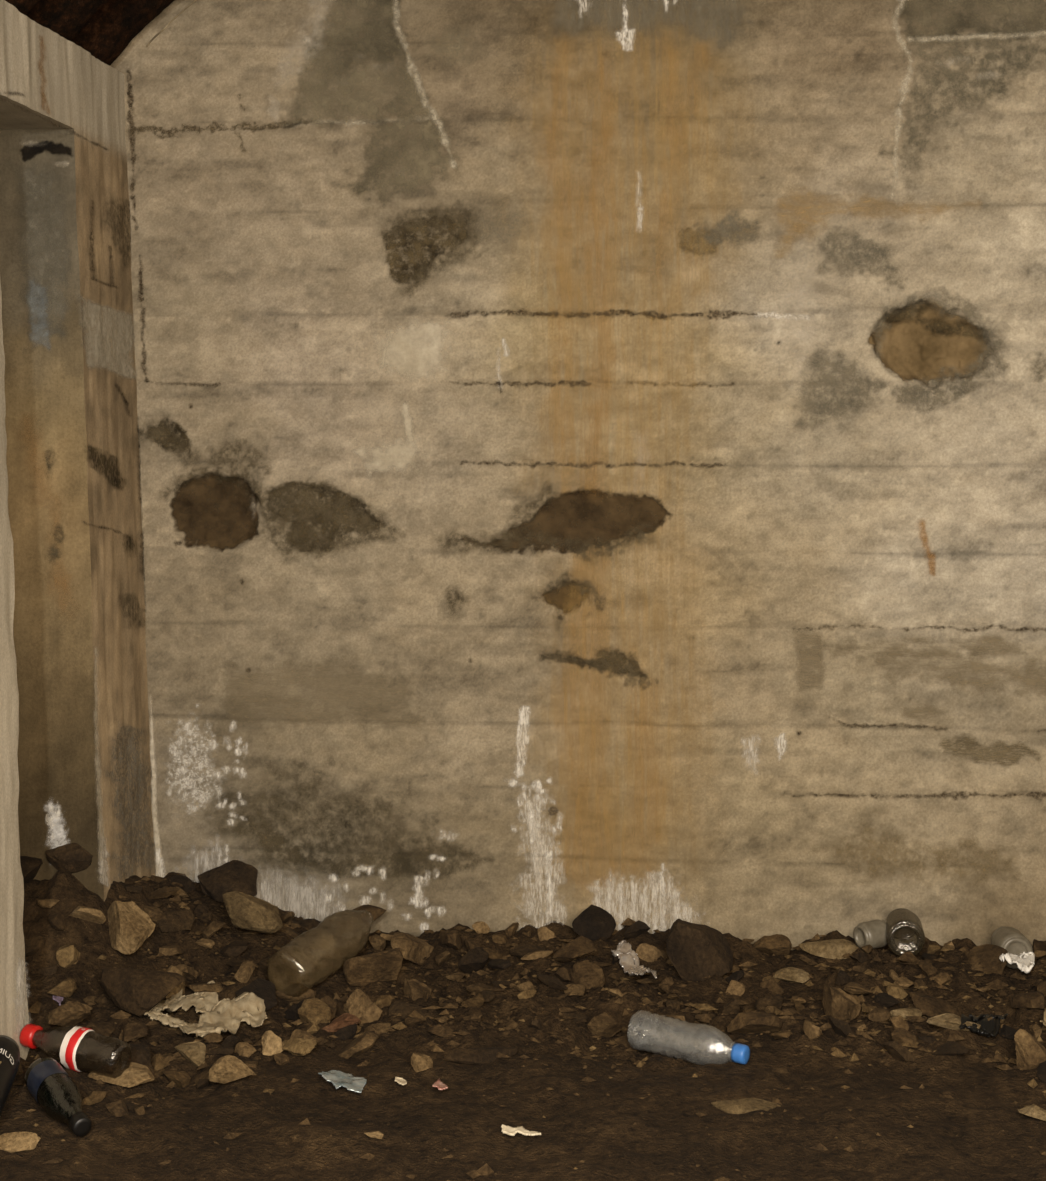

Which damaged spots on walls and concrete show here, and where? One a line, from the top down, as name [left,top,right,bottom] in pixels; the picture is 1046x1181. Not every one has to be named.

crack [2,40,312,222]
spalling [383,209,477,292]
spalling [868,296,1008,396]
spalling [138,419,395,556]
spalling [446,485,670,558]
spalling [542,573,602,620]
spalling [542,650,650,684]
damp [95,649,478,930]
efflorescence [510,706,567,928]
efflorescence [592,864,691,933]